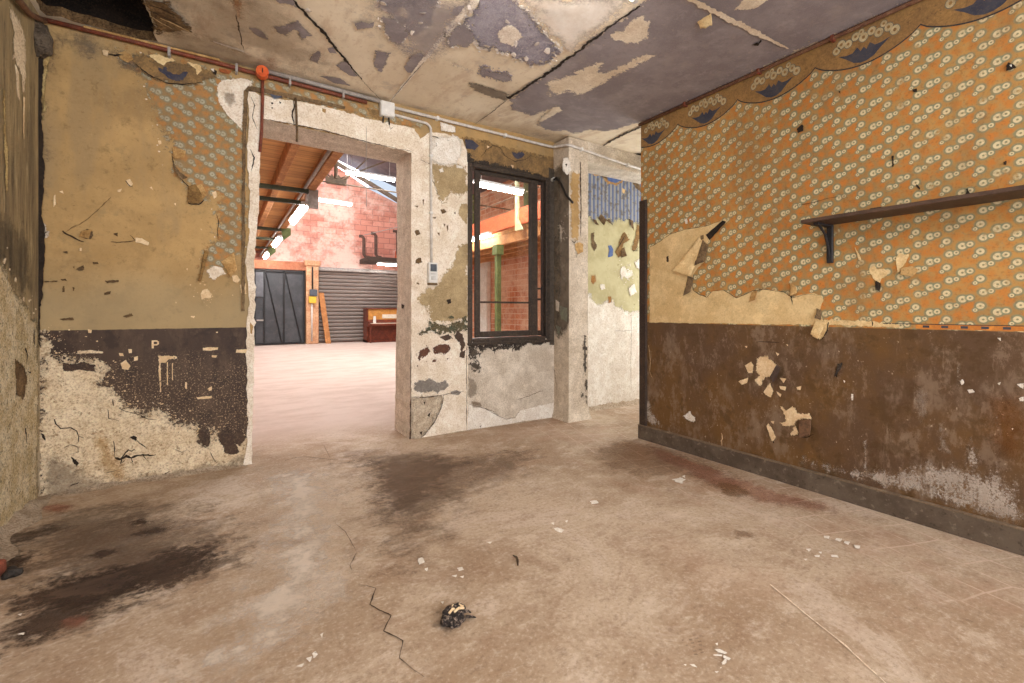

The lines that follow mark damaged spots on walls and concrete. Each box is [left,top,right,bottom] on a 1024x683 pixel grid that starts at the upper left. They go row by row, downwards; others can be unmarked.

peeling [310,47,357,86]
peeling [355,17,409,72]
peeling [404,53,425,73]
peeling [446,0,910,134]
flaking render [0,68,568,527]
peeling [739,341,813,443]
damp [851,448,1021,520]
damp [10,530,44,544]
damp [4,545,218,646]
crack [335,523,424,677]